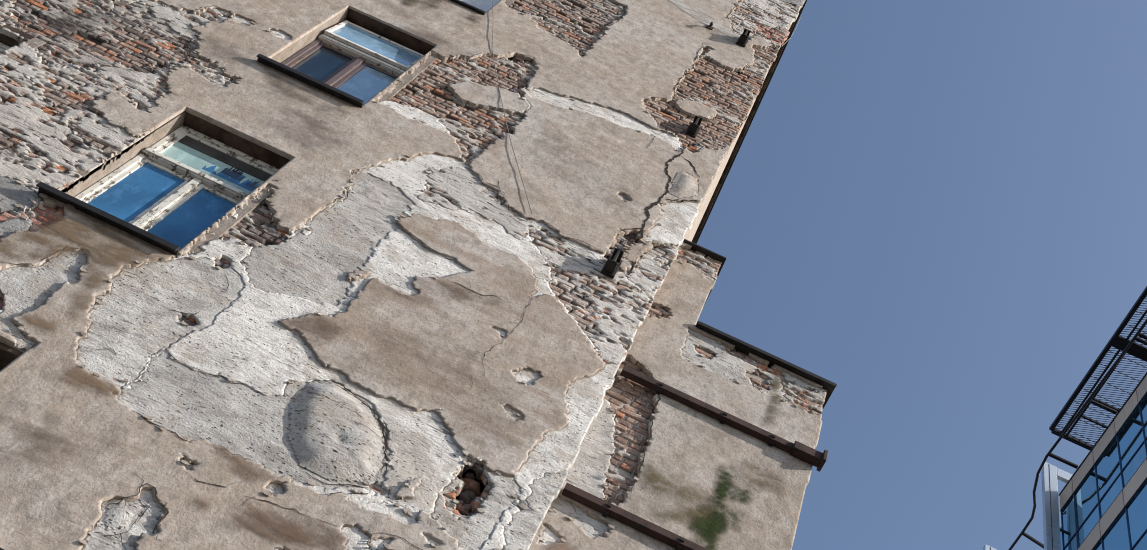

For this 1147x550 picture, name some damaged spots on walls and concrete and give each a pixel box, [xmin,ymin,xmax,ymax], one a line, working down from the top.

peeling [0,0,235,238]
crack [481,43,708,275]
peeling [0,249,88,353]
peeling [76,0,805,550]
peeling [681,329,827,415]
damp [646,464,715,536]
damp [731,476,780,524]